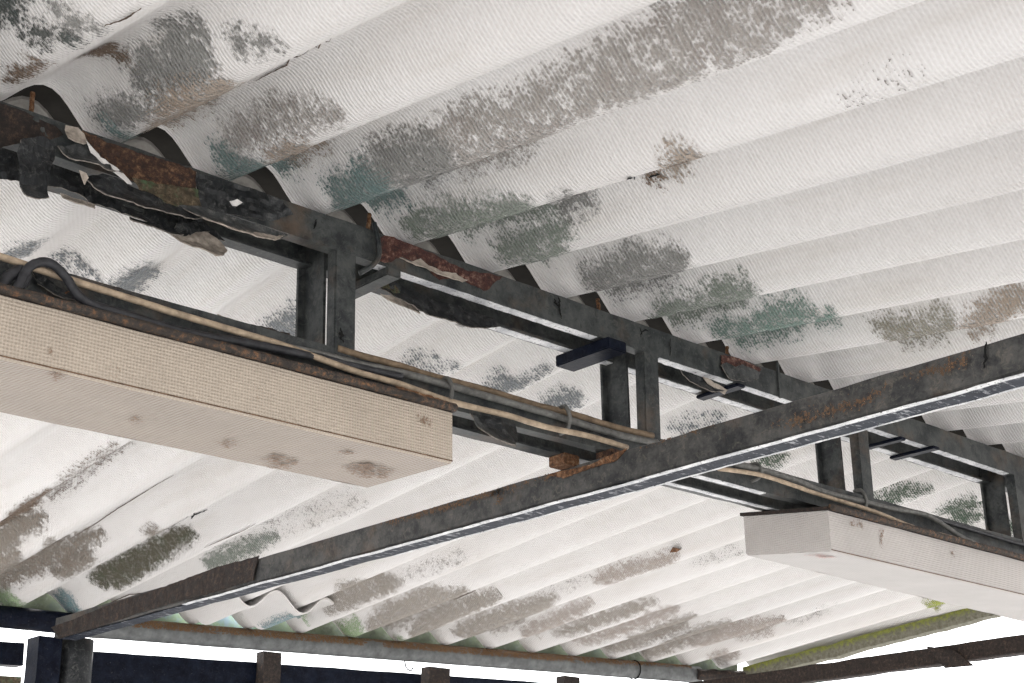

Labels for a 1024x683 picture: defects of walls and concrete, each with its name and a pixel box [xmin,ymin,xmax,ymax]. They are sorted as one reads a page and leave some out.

rust [82,130,202,207]
peeling [0,0,854,354]
rust [380,236,502,291]
rust [380,446,649,526]